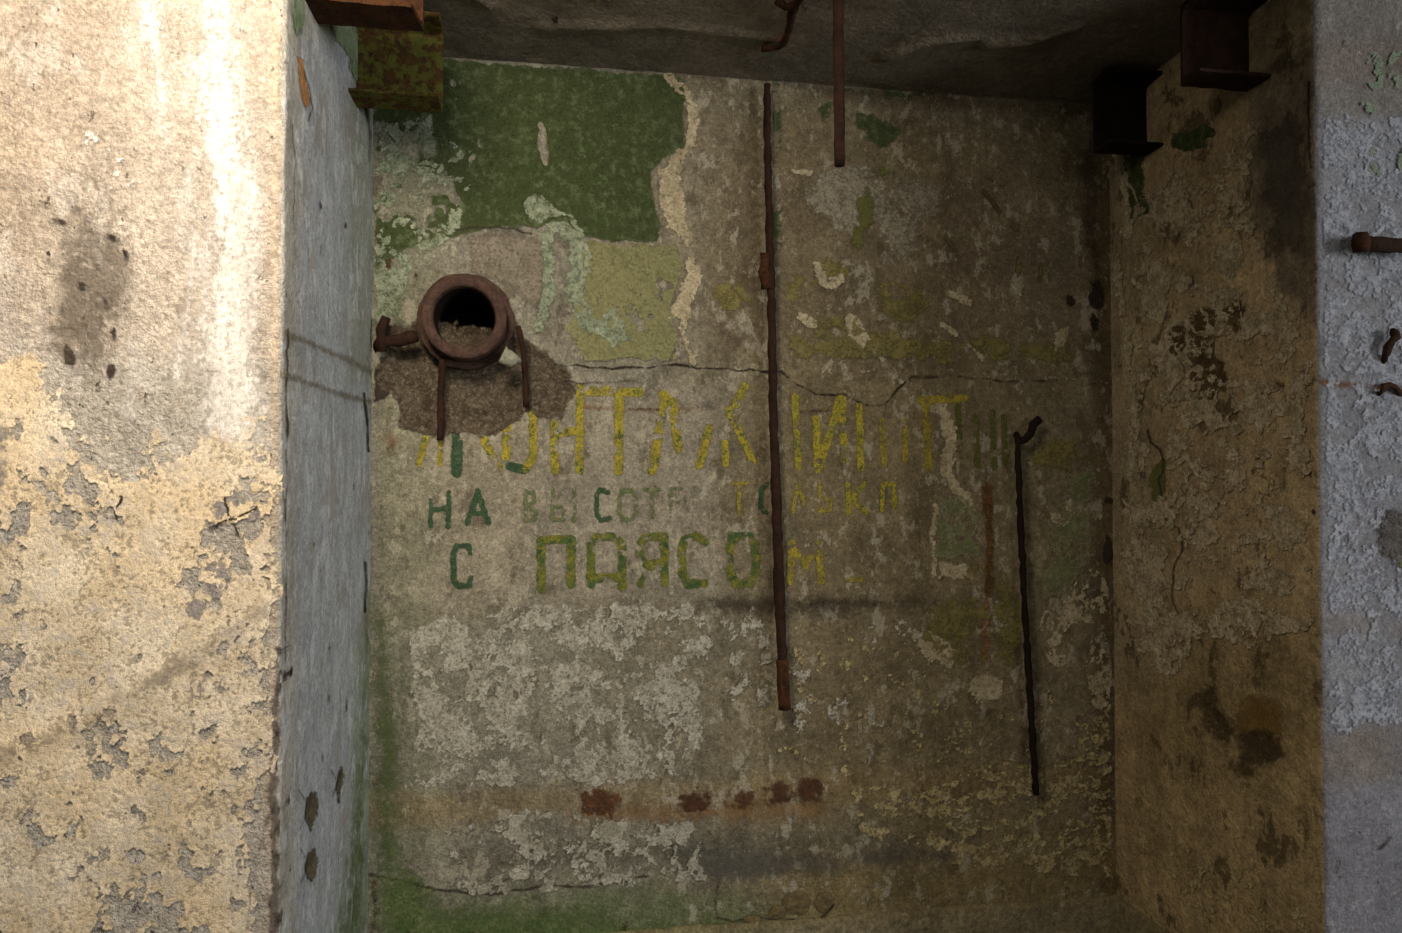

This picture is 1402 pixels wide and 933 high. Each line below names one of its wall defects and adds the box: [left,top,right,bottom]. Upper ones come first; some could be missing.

peeling [373,58,703,441]
spalling [63,344,75,365]
peeling [0,351,286,933]
peeling [408,600,772,788]
rust [576,788,622,821]
rust [677,777,833,816]
peeling [444,808,708,895]